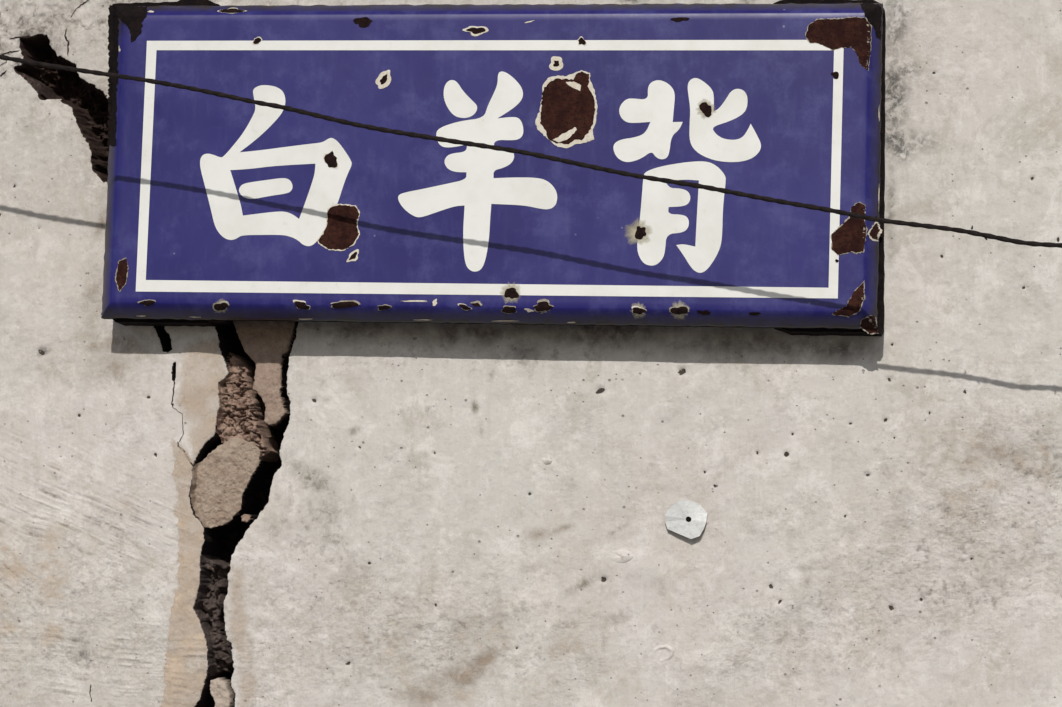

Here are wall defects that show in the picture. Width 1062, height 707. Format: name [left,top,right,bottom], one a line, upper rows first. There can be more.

crack [64,0,88,55]
crack [0,35,32,76]
crack [154,321,299,707]